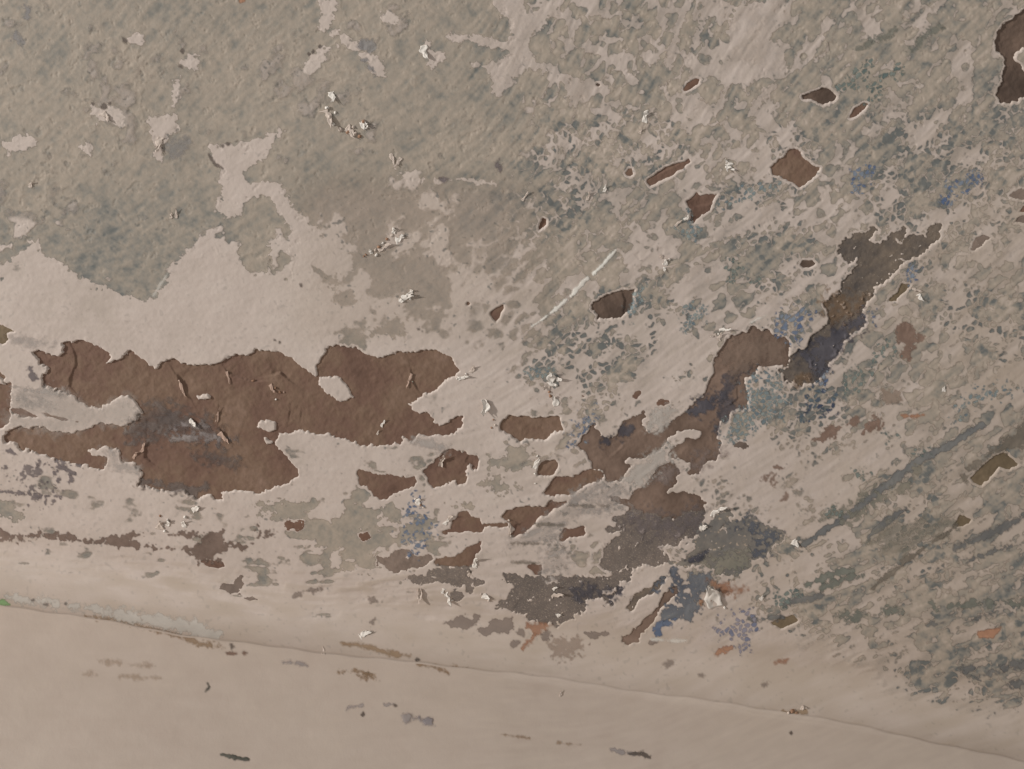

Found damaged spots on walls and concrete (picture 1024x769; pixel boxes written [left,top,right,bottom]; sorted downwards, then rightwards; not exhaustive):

flaking render [0,328,475,528]
peeling [0,0,1024,498]
leakage [532,276,589,327]
leakage [685,299,867,435]
leakage [812,414,884,443]
leakage [895,322,925,362]
peeling [256,449,567,607]
flaking render [622,576,678,645]
peeling [495,461,832,628]
leakage [648,513,784,645]
peeling [751,403,1024,709]
leakage [970,660,1024,689]